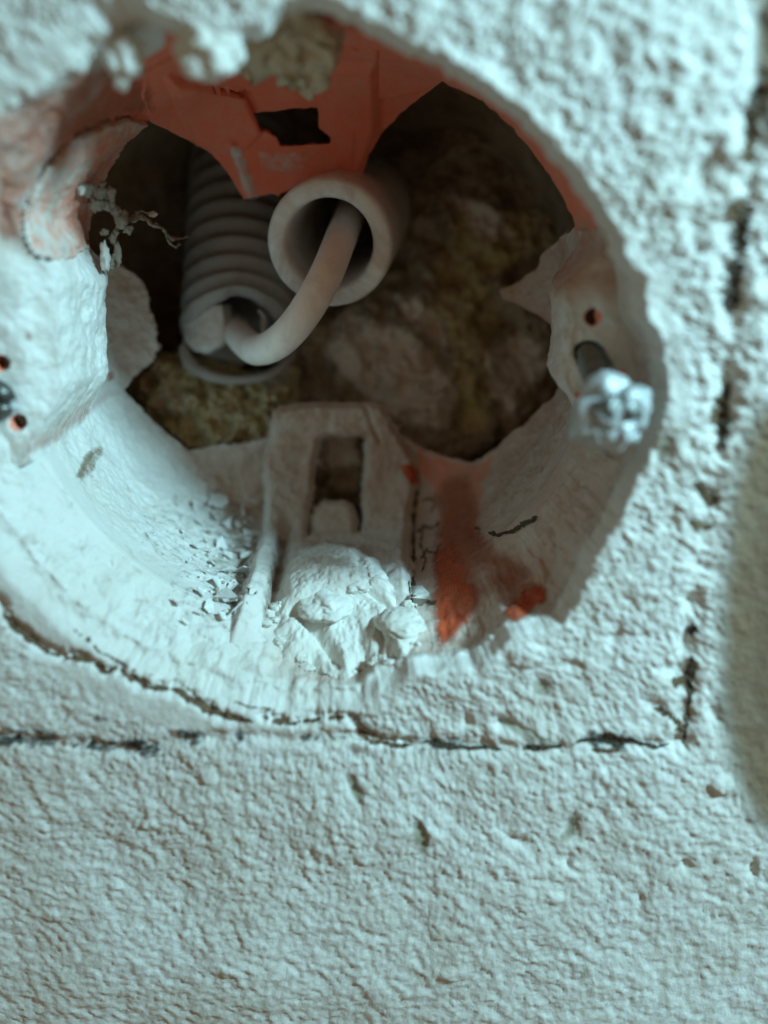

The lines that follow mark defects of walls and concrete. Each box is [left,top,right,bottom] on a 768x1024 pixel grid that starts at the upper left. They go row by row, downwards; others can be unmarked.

spalling [0,68,240,367]
spalling [285,107,331,146]
spalling [357,216,373,243]
spalling [370,82,575,240]
crack [3,611,701,753]